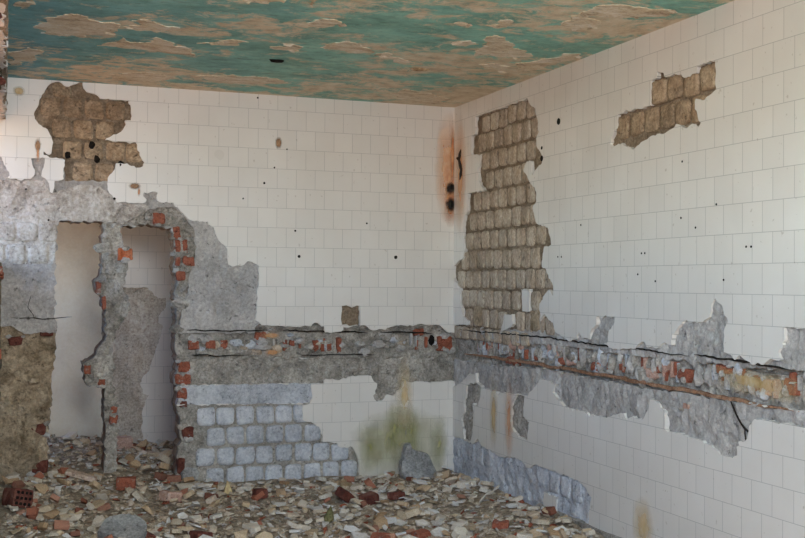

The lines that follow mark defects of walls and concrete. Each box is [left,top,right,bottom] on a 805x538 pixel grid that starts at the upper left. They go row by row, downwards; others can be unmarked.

peeling [33,13,247,57]
peeling [198,74,289,85]
peeling [613,62,716,148]
corrosion [445,136,462,215]
flaking render [0,82,267,481]
peeling [341,305,359,326]
peeling [413,100,805,524]
corrosion [466,354,799,412]
peeling [173,361,359,499]
crack [730,401,749,440]
spalling [334,486,405,505]
spalling [189,530,213,538]